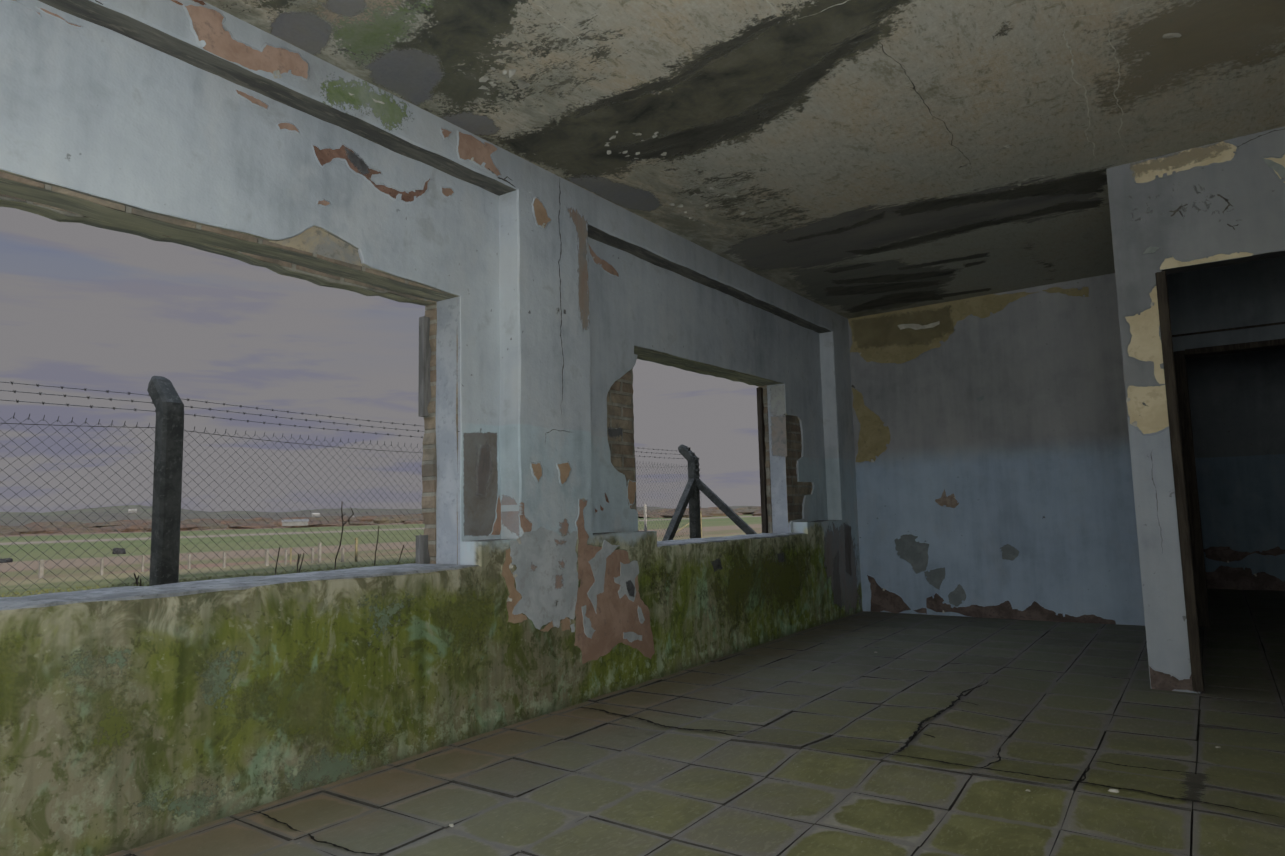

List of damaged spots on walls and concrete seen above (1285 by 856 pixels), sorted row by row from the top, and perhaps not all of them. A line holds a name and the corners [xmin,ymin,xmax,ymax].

peeling [182,2,333,81]
damp [221,0,321,18]
damp [1094,0,1285,114]
peeling [276,121,454,204]
damp [323,0,1111,313]
peeling [1130,141,1239,186]
peeling [848,286,1090,365]
peeling [1123,251,1254,436]
flaking render [607,368,636,510]
peeling [463,432,655,665]
peeling [866,534,1117,624]
crack [847,682,1282,818]